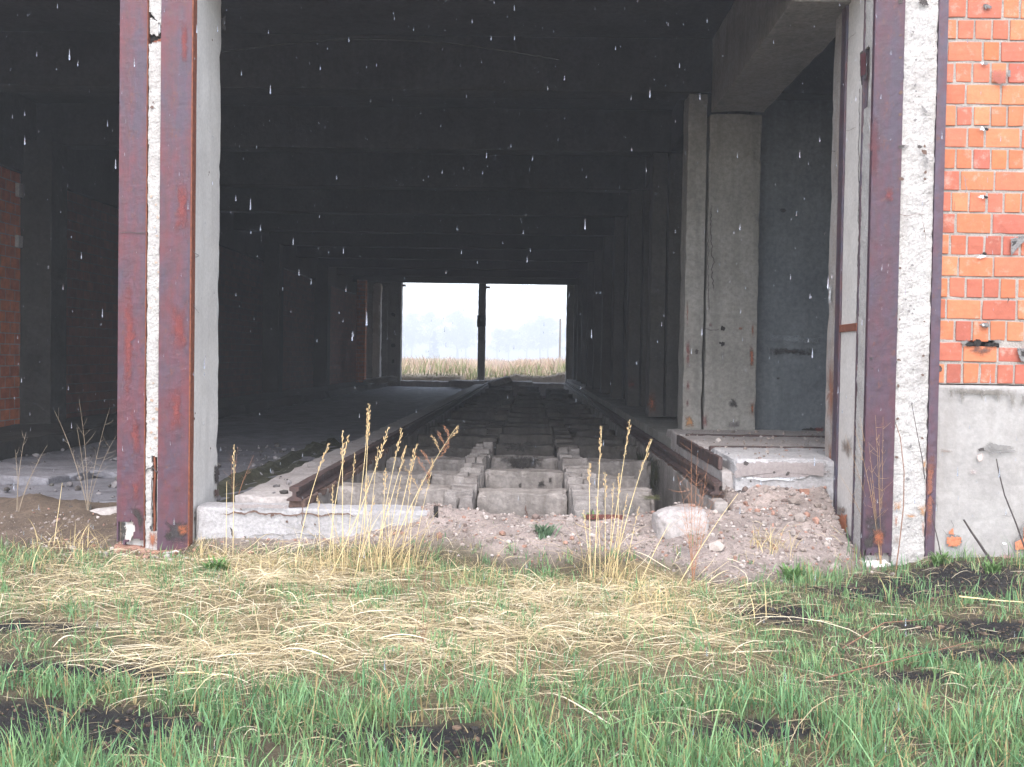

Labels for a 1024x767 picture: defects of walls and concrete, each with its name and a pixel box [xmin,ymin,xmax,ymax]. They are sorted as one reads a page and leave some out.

hole [961,322,1001,353]